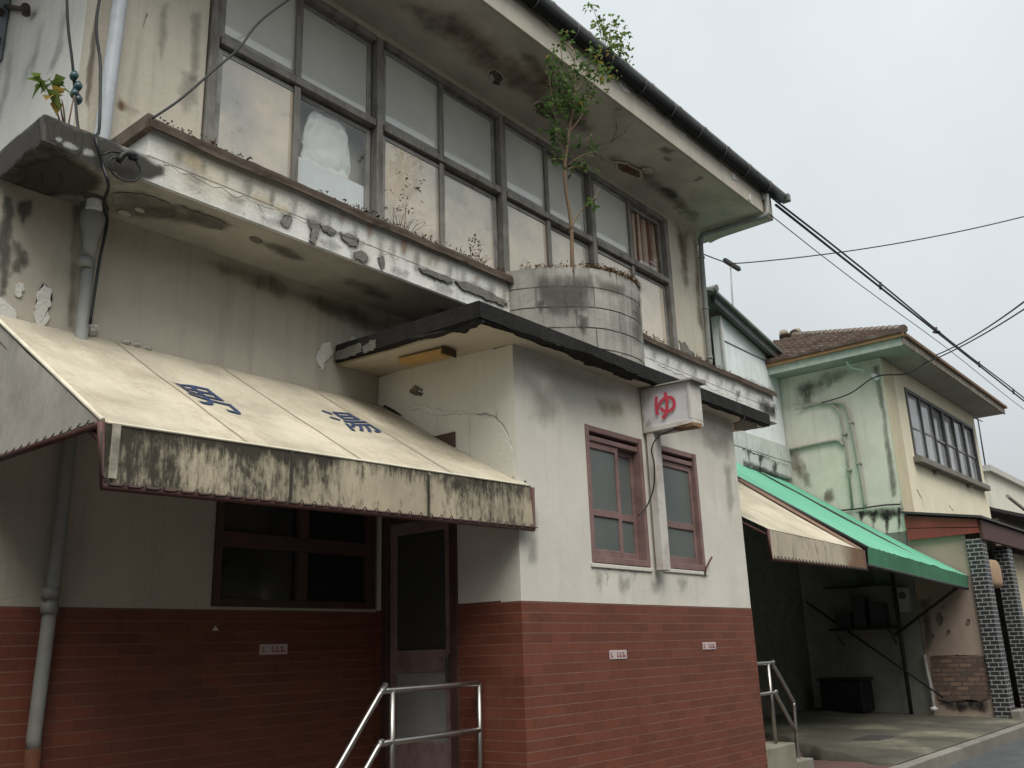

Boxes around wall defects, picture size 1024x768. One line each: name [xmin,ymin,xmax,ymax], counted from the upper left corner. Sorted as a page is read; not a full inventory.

water stain [0,116,164,295]
peeling [280,213,293,228]
peeling [307,219,385,270]
peeling [0,282,25,319]
peeling [33,283,52,325]
water stain [538,278,619,332]
peeling [315,336,377,370]
water stain [859,508,900,530]